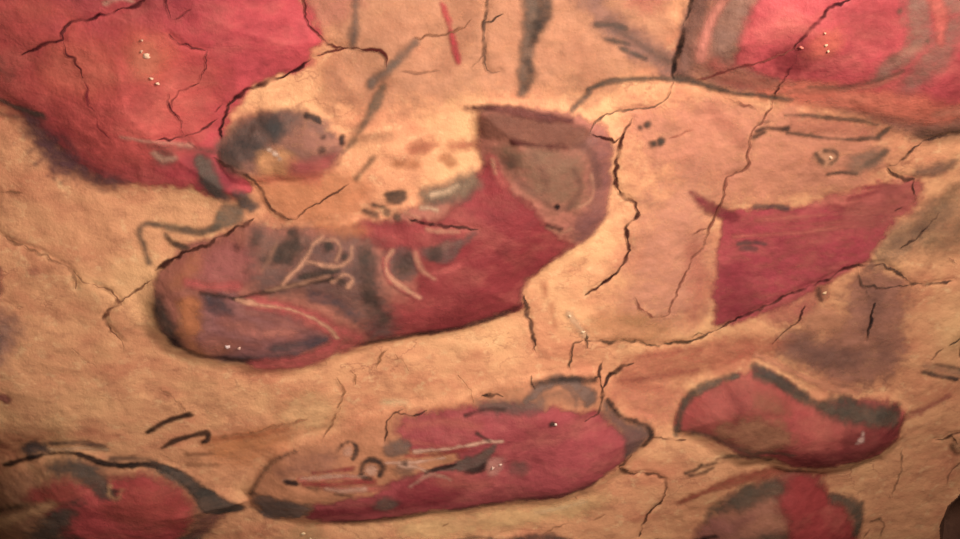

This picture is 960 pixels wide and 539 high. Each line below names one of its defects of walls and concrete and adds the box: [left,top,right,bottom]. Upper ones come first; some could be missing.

crack [7,0,441,347]
crack [415,0,503,73]
crack [586,0,694,295]
crack [695,0,850,240]
crack [888,134,948,211]
crack [568,220,955,422]